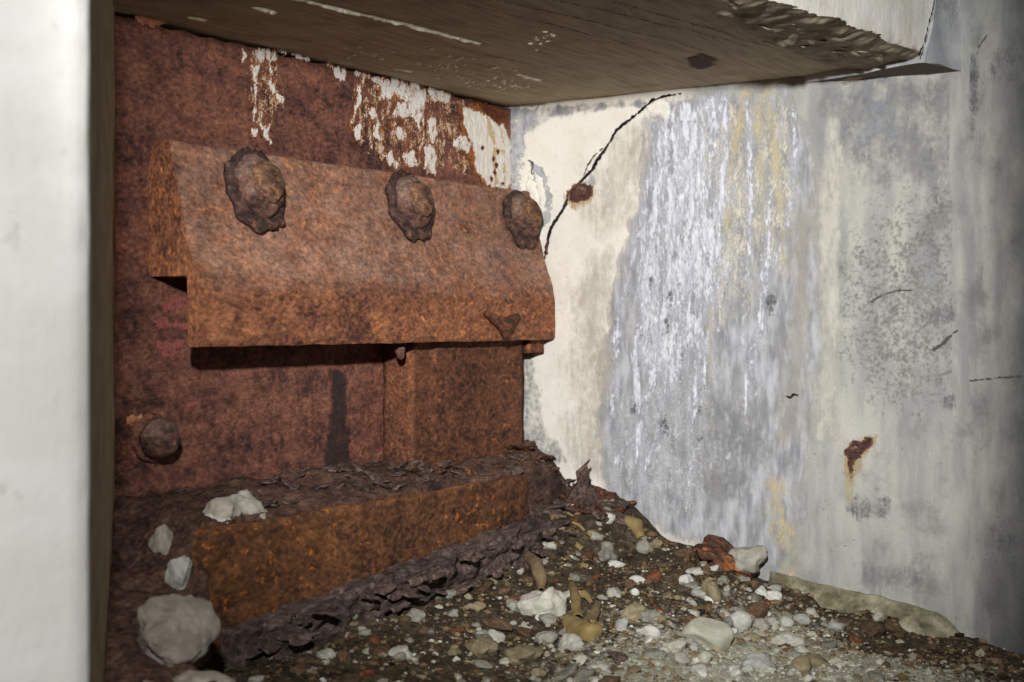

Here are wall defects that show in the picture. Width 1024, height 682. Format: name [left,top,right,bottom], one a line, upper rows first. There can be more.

spalling [713,0,925,71]
corrosion [566,173,596,210]
crack [544,93,682,259]
crack [870,289,912,302]
water stain [580,82,954,576]
crack [932,330,958,351]
corrosion [230,474,305,508]
corrosion [314,460,478,490]
corrosion [844,436,878,498]
corrosion [221,510,559,667]